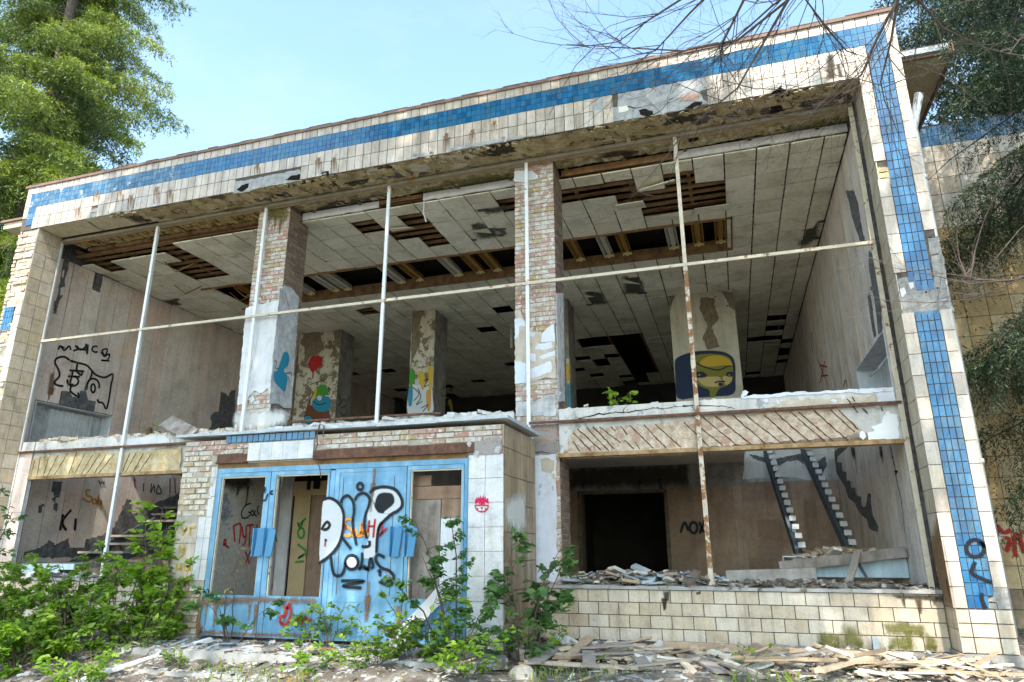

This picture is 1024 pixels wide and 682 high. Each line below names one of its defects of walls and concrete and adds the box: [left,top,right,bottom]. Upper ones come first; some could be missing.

flaking render [732,79,855,120]
leakage [662,114,701,129]
spalling [204,76,724,214]
leakage [480,135,546,157]
leakage [599,151,638,163]
peeling [411,310,425,364]
flaking render [210,285,343,431]
spalling [514,291,899,582]
corrosion [711,436,882,447]
leakage [889,631,936,651]